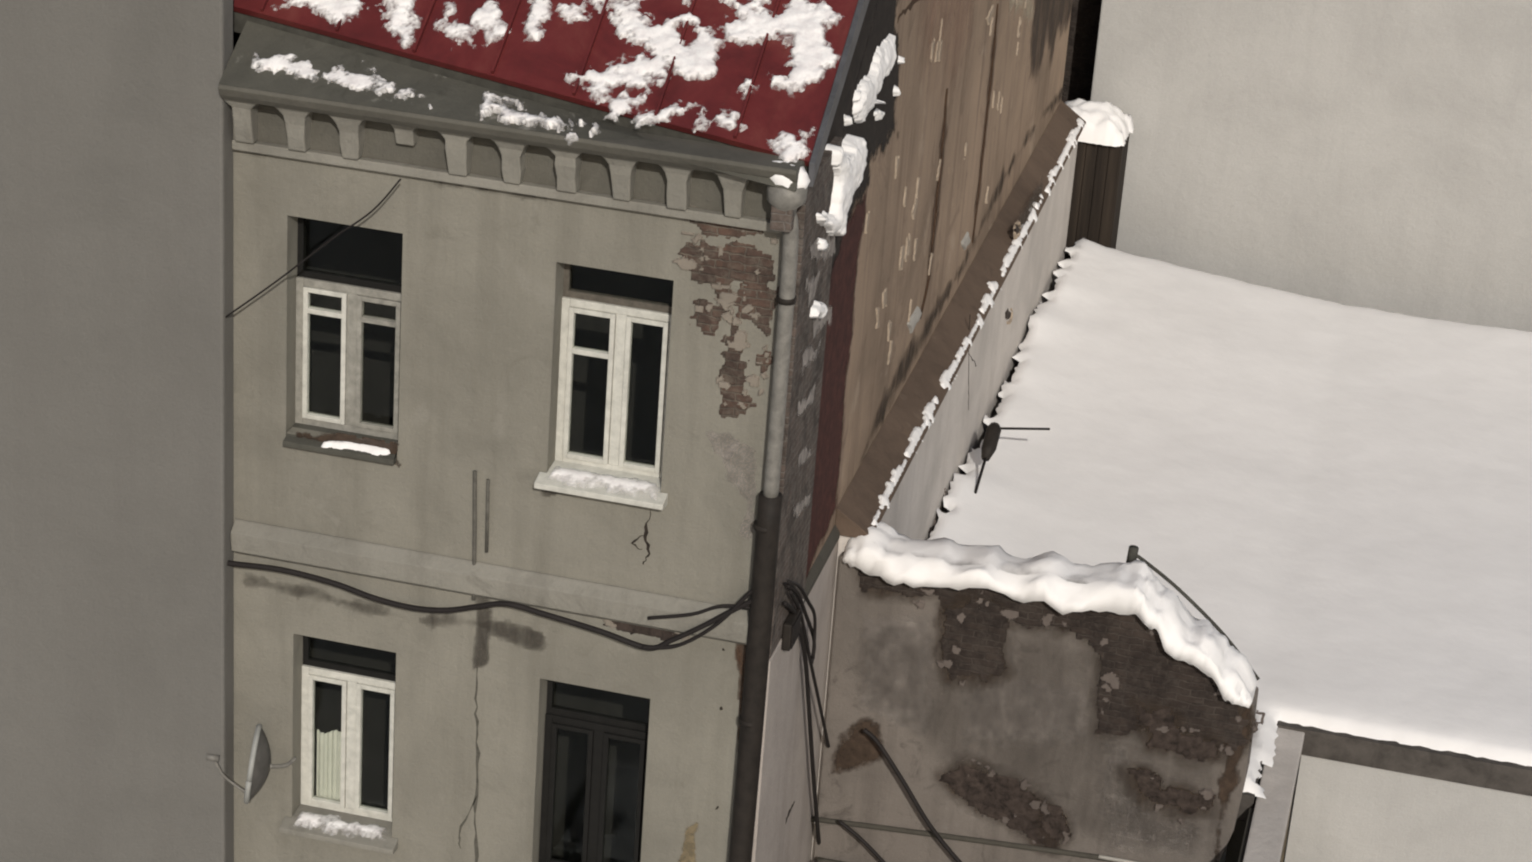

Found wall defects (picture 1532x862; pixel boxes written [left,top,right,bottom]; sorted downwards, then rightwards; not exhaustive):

crack [897,0,919,24]
leakage [1031,0,1074,73]
flaking render [672,206,779,419]
flaking render [858,569,1265,762]
crack [458,667,480,862]
flaking render [938,758,1072,848]
flaking render [1126,767,1216,825]